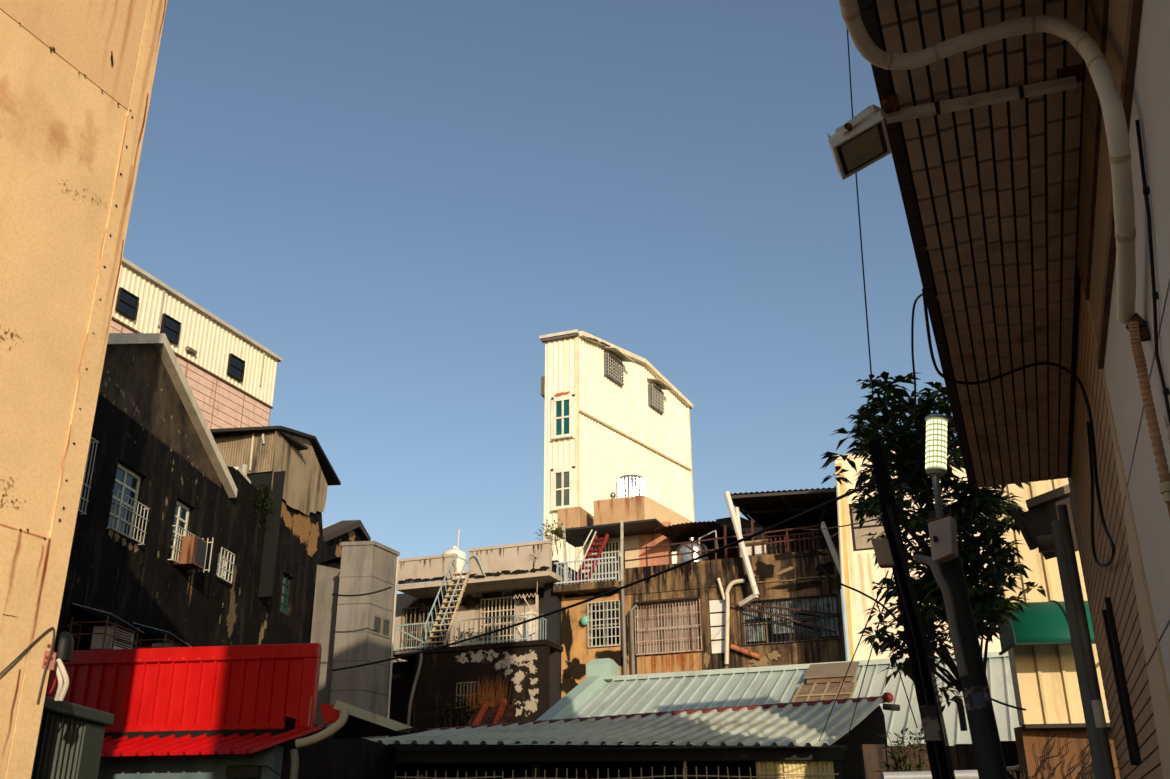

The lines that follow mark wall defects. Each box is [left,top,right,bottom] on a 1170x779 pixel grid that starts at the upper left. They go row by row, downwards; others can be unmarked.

peeling [281,500,320,557]
corrosion [26,532,50,623]
peeling [455,608,544,717]